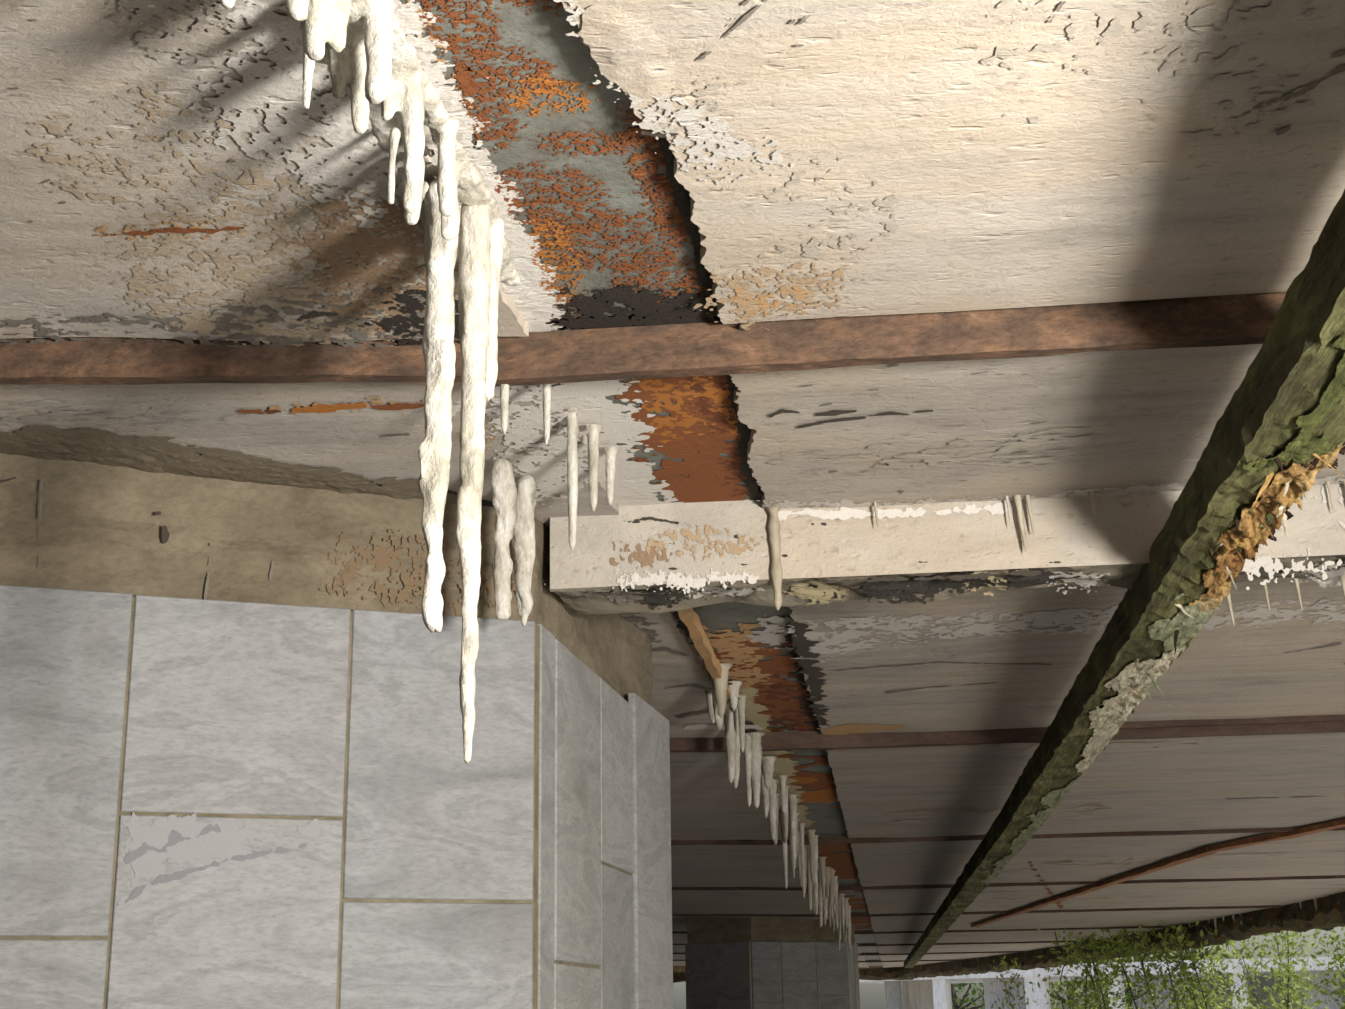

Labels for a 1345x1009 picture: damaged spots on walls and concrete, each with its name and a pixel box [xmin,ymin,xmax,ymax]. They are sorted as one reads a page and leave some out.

crack [1242,50,1345,135]
rust [94,216,247,241]
leakage [0,0,426,348]
leakage [392,0,572,332]
rust [404,0,710,330]
rust [237,397,424,414]
rust [615,375,763,503]
leakage [610,524,1118,663]
spalling [846,561,1067,604]
spalling [1238,562,1300,577]
leakage [1203,548,1345,630]
rust [702,622,906,735]